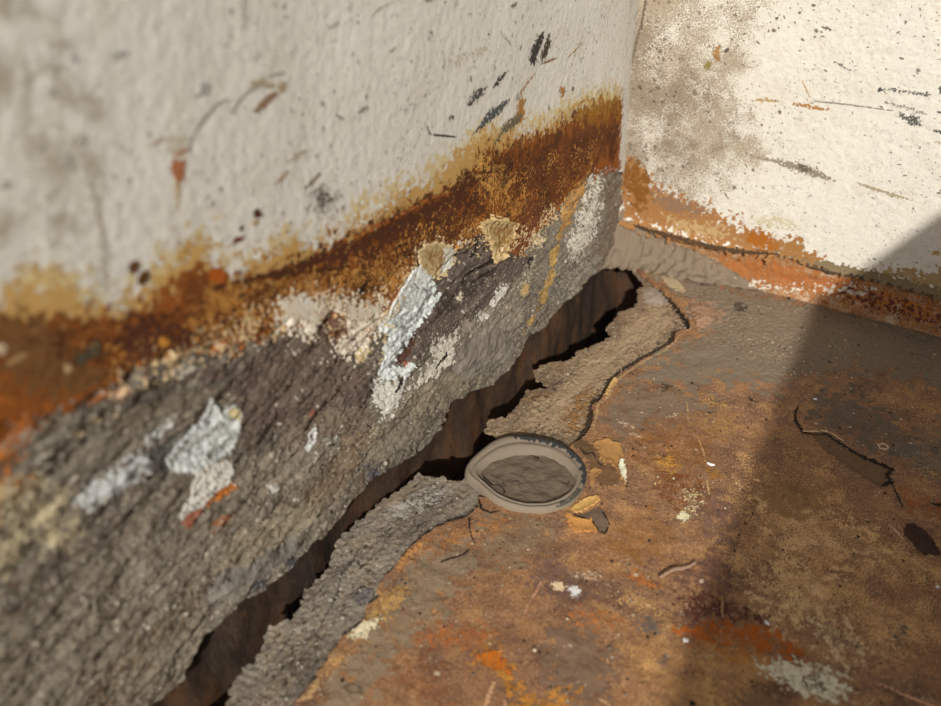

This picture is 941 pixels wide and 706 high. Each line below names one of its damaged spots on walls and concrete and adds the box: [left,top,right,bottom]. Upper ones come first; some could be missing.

peeling [535,0,864,252]
peeling [847,121,941,210]
spalling [642,275,686,306]
spalling [0,169,631,706]
crack [369,375,404,398]
crack [576,279,690,465]
crack [794,405,903,507]
rust [0,373,316,706]
crack [440,474,520,563]
rust [517,415,828,704]
rust [904,523,940,555]
rust [411,618,584,706]